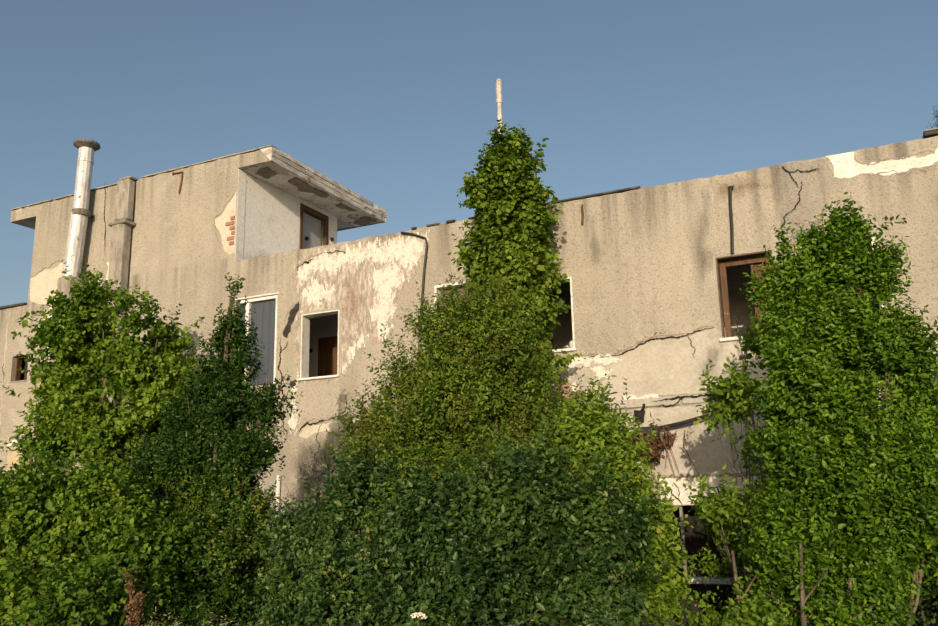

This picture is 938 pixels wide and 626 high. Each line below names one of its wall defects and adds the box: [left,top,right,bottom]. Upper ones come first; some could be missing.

flaking render [213,191,237,254]
crack [782,166,820,223]
flaking render [826,147,938,184]
peeling [282,229,431,436]
crack [567,327,714,364]
flaking render [557,322,772,401]